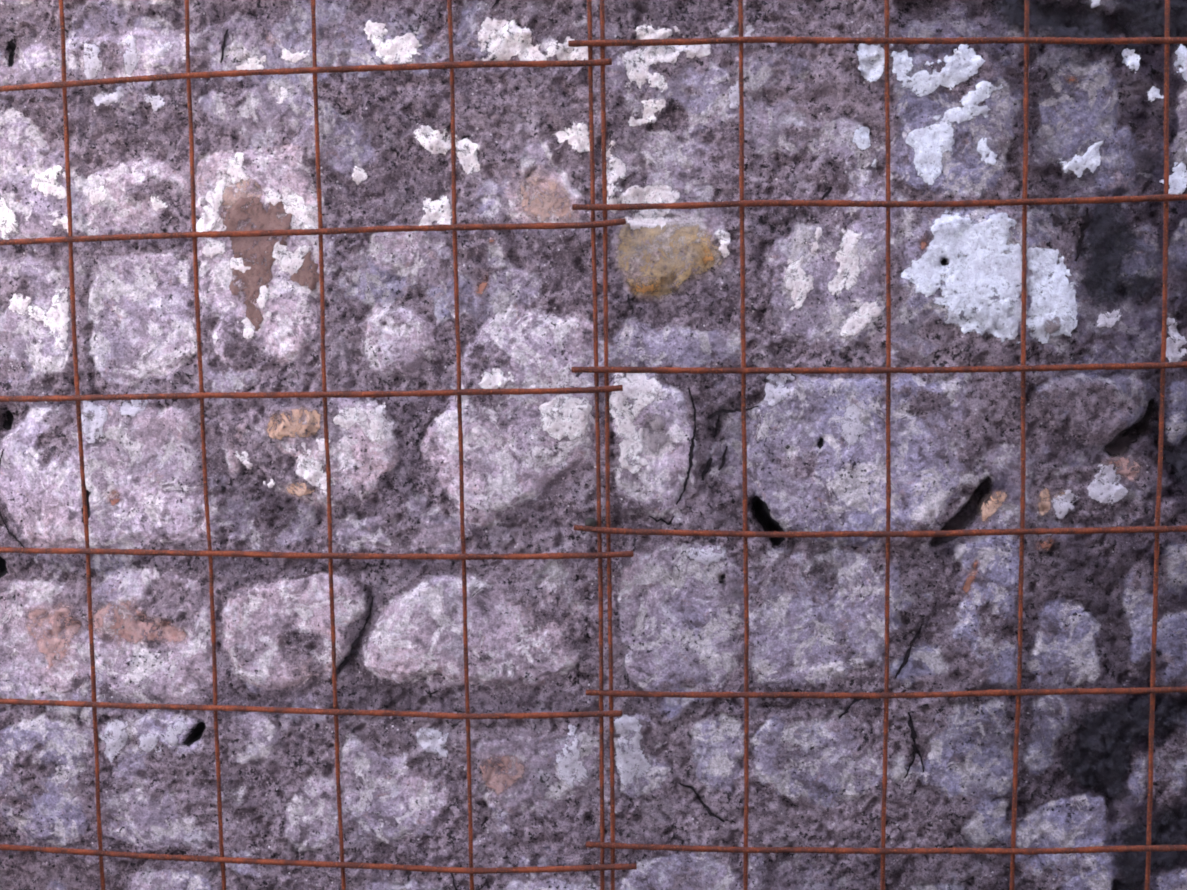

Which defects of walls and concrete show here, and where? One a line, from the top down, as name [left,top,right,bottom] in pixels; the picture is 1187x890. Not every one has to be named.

rust [616,224,723,298]
crack [649,388,759,525]
rust [963,560,978,593]